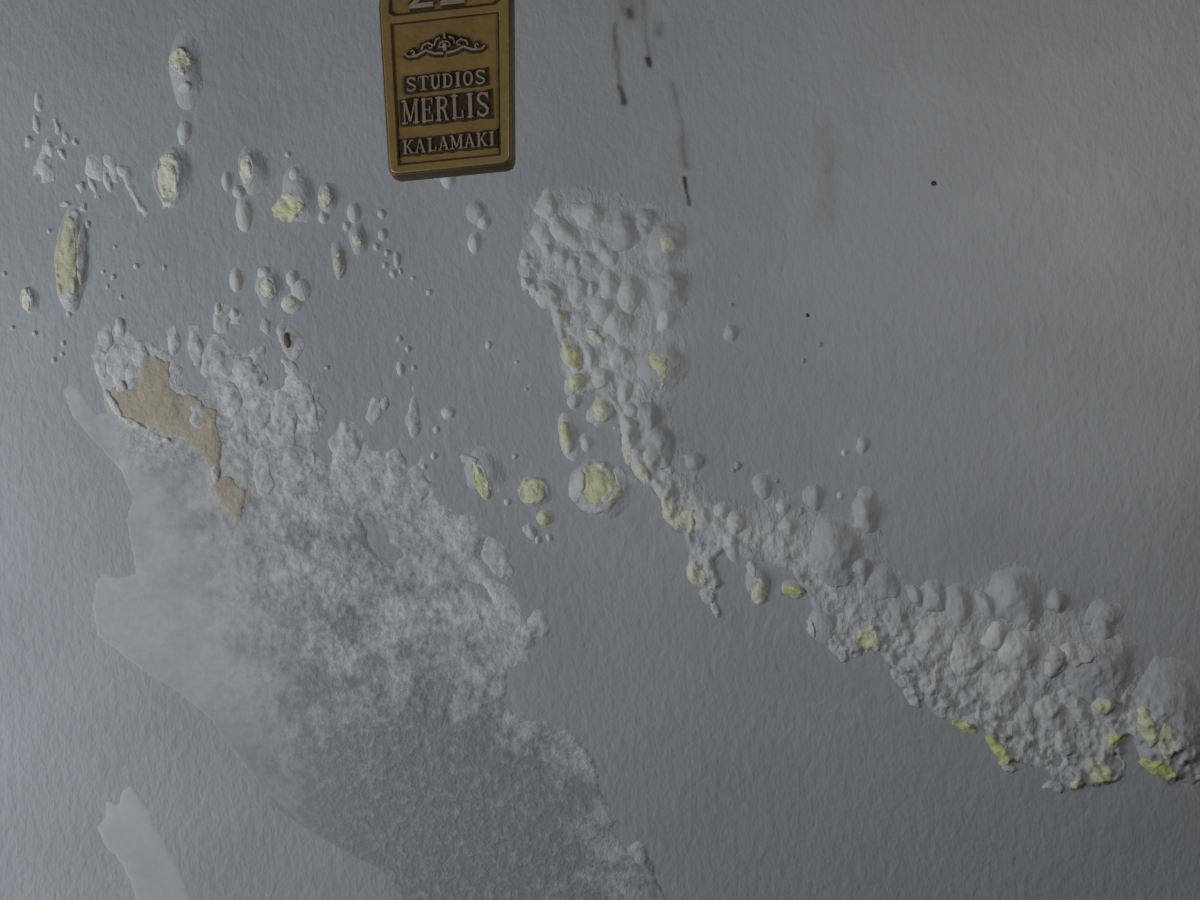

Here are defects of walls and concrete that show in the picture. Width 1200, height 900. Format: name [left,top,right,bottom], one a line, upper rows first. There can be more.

peeling [64,303,666,900]